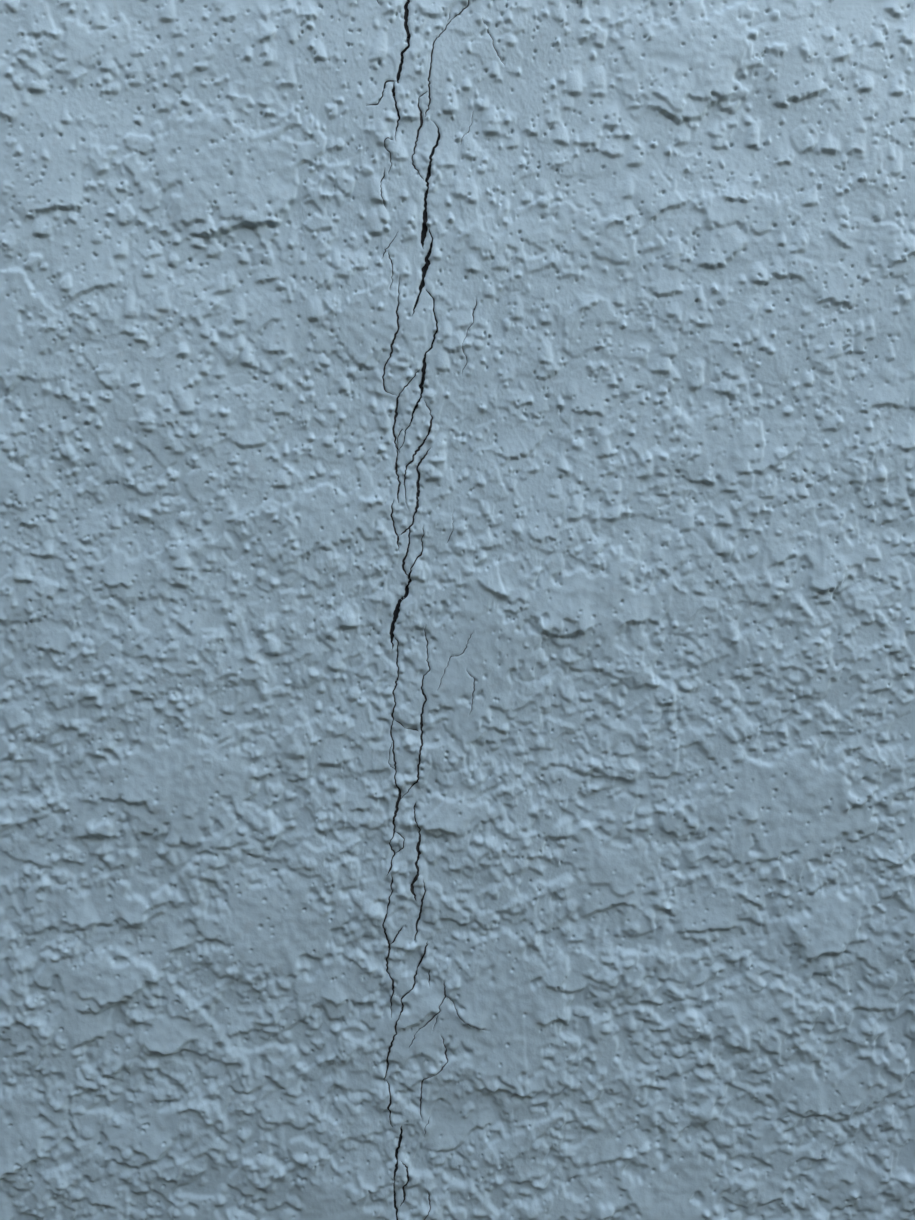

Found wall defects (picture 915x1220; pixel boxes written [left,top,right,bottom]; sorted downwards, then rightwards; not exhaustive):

crack [370,0,503,1220]